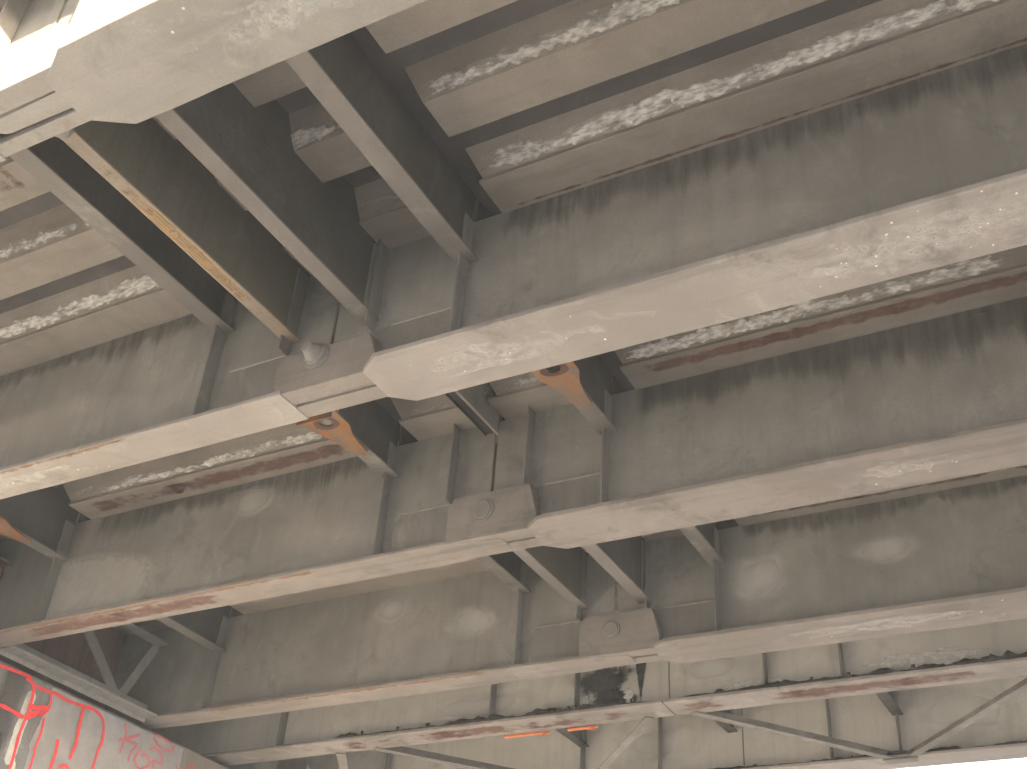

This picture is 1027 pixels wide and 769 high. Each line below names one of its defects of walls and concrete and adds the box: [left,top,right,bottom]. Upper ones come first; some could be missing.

efflorescence [426,0,680,94]
damp [490,0,999,167]
corrosion [145,208,244,298]
damp [0,275,158,338]
damp [626,256,1000,359]
corrosion [653,273,1027,370]
damp [81,432,322,493]
corrosion [162,445,341,494]
corrosion [789,465,1027,510]
corrosion [5,572,310,636]
damp [593,662,647,705]
corrosion [780,672,975,699]